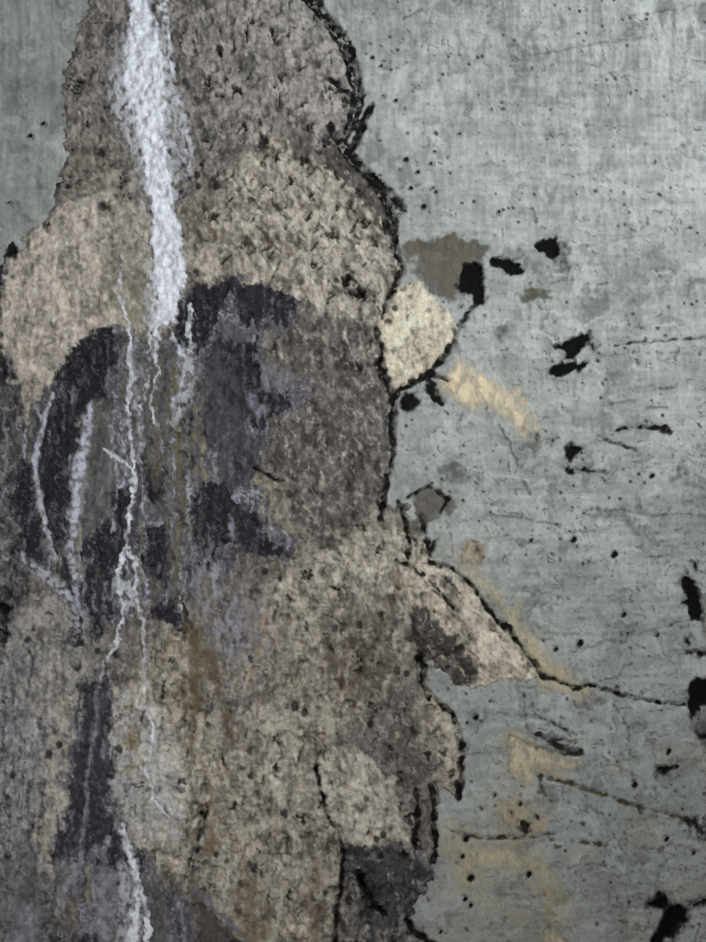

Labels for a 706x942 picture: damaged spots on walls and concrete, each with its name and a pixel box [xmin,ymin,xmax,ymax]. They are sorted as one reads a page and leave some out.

spalling [358,103,373,133]
spalling [6,243,17,257]
peeling [377,232,550,412]
crack [303,0,687,706]
damp [0,0,314,942]
crack [249,463,283,482]
peeling [408,484,456,533]
peeling [404,551,539,689]
peeling [413,685,464,795]
spalling [510,812,539,834]